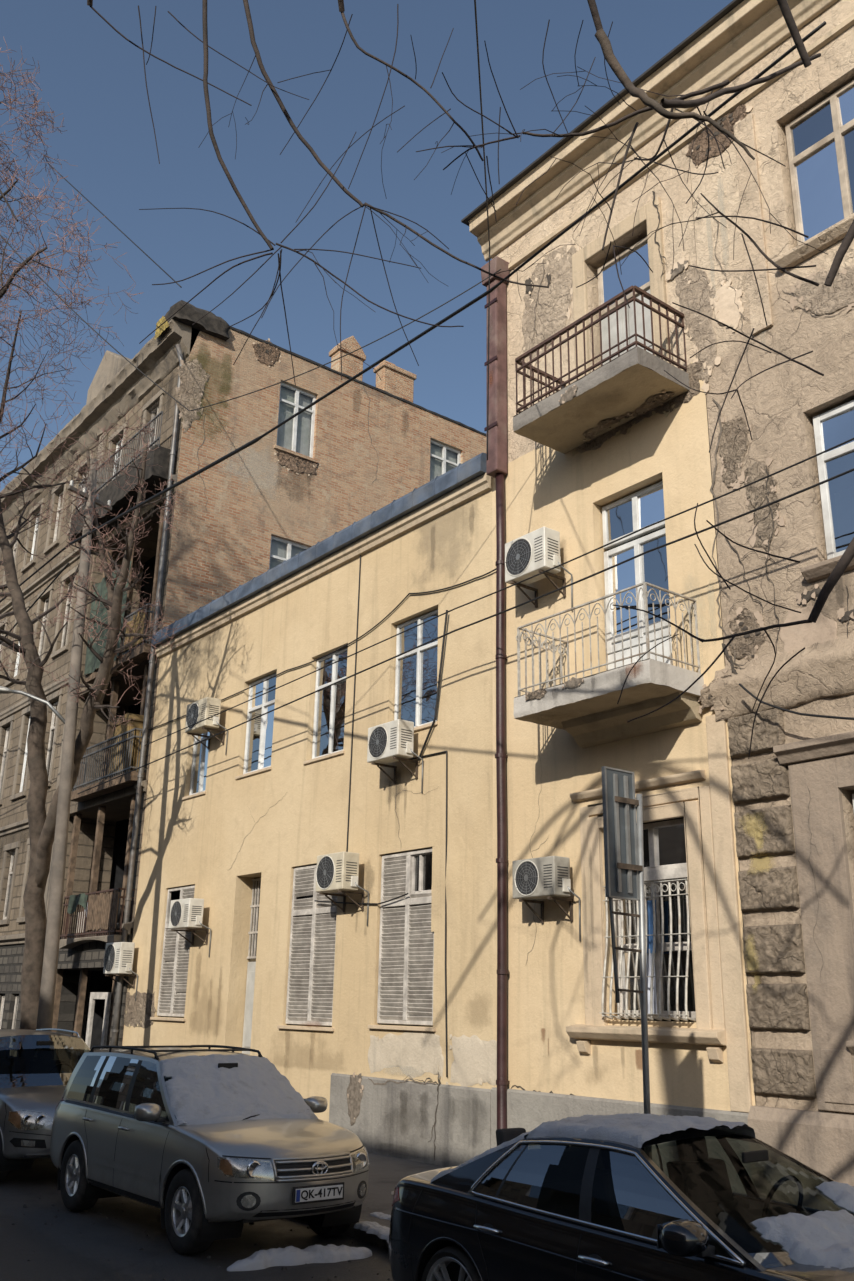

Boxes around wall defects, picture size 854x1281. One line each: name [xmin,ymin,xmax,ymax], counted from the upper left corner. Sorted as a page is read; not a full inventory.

spalling [686,104,753,168]
flaking render [522,240,580,367]
spalling [252,338,281,368]
flaking render [572,257,744,456]
flaking render [175,358,211,433]
spalling [274,451,321,476]
spalling [716,416,785,559]
flaking render [727,584,854,662]
spalling [697,673,732,714]
spalling [347,1072,364,1126]